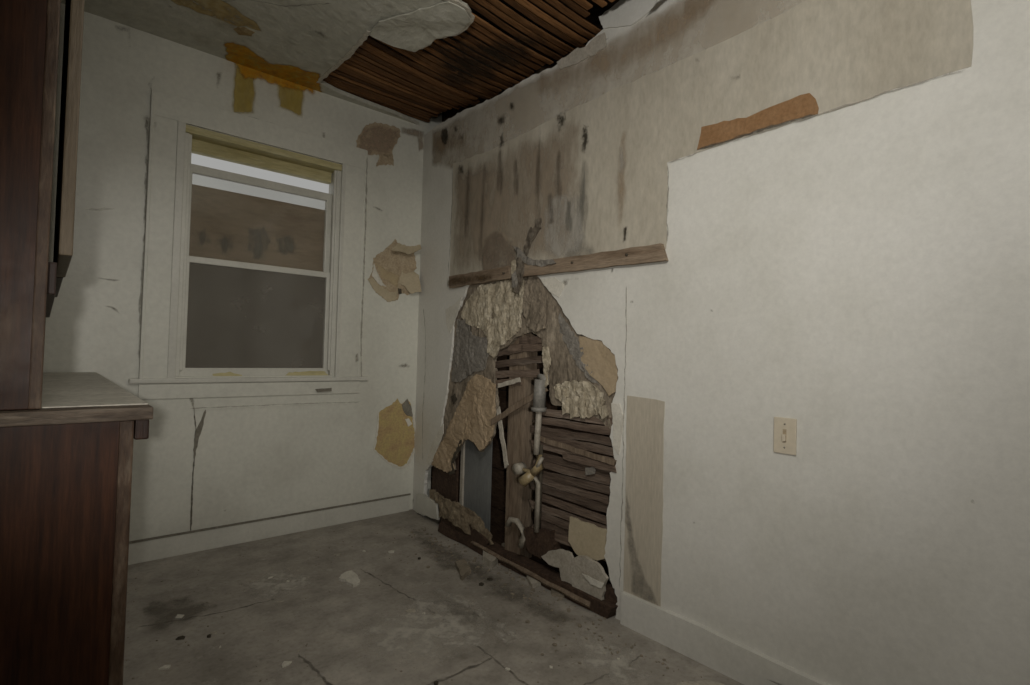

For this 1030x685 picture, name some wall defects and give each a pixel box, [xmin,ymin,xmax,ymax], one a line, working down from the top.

flaking render [316,0,658,122]
leakage [622,0,784,82]
peeling [356,122,401,167]
leakage [405,68,591,270]
peeling [368,239,422,302]
flaking render [431,276,624,475]
crack [190,398,266,531]
flaking render [373,398,415,469]
crack [433,634,513,683]